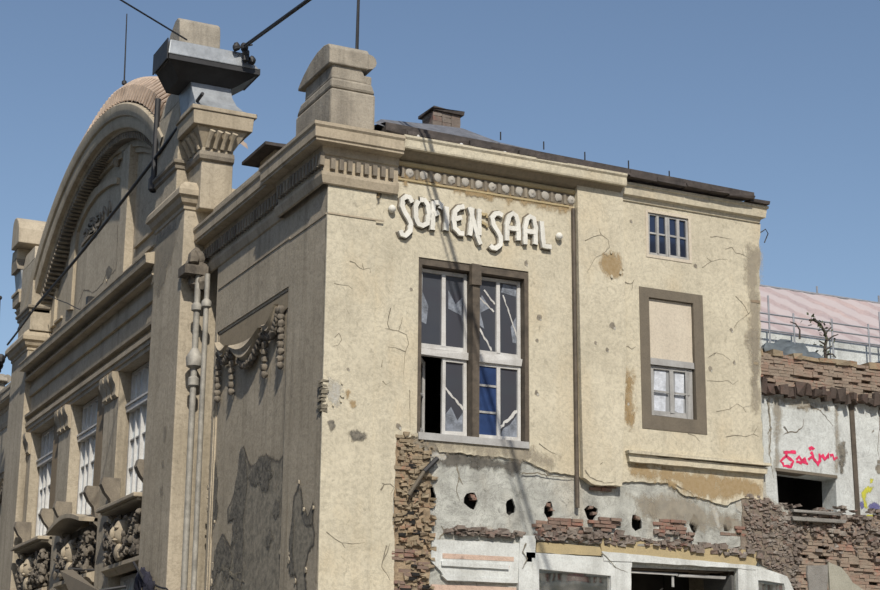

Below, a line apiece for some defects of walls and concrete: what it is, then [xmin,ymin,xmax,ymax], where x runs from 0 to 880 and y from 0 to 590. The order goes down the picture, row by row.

leakage [745,247,846,473]
peeling [206,446,315,590]
spalling [392,423,880,590]